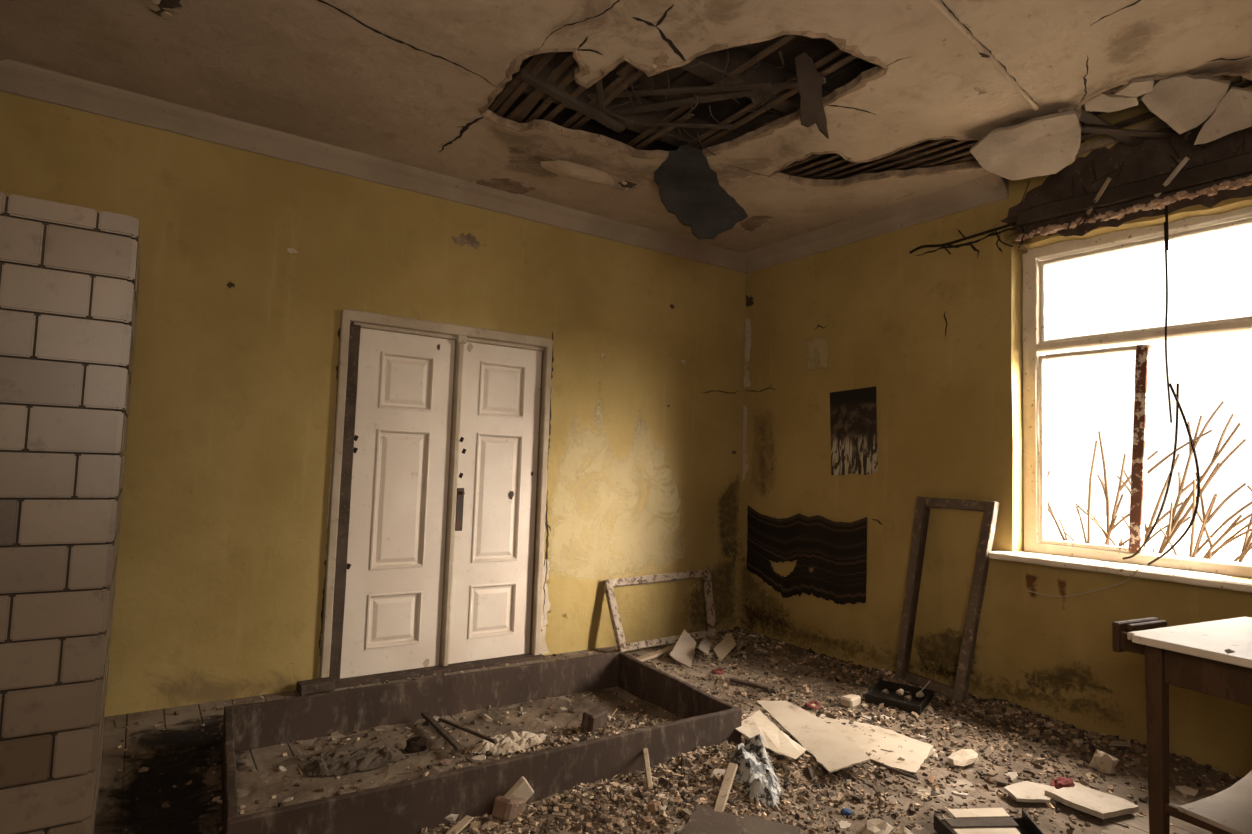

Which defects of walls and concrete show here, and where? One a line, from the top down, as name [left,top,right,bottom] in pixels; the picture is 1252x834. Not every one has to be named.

crack [317,0,497,87]
crack [537,0,686,61]
crack [1090,0,1141,26]
crack [1080,56,1088,102]
crack [438,117,484,153]
peeling [470,176,536,198]
spalling [1001,116,1252,245]